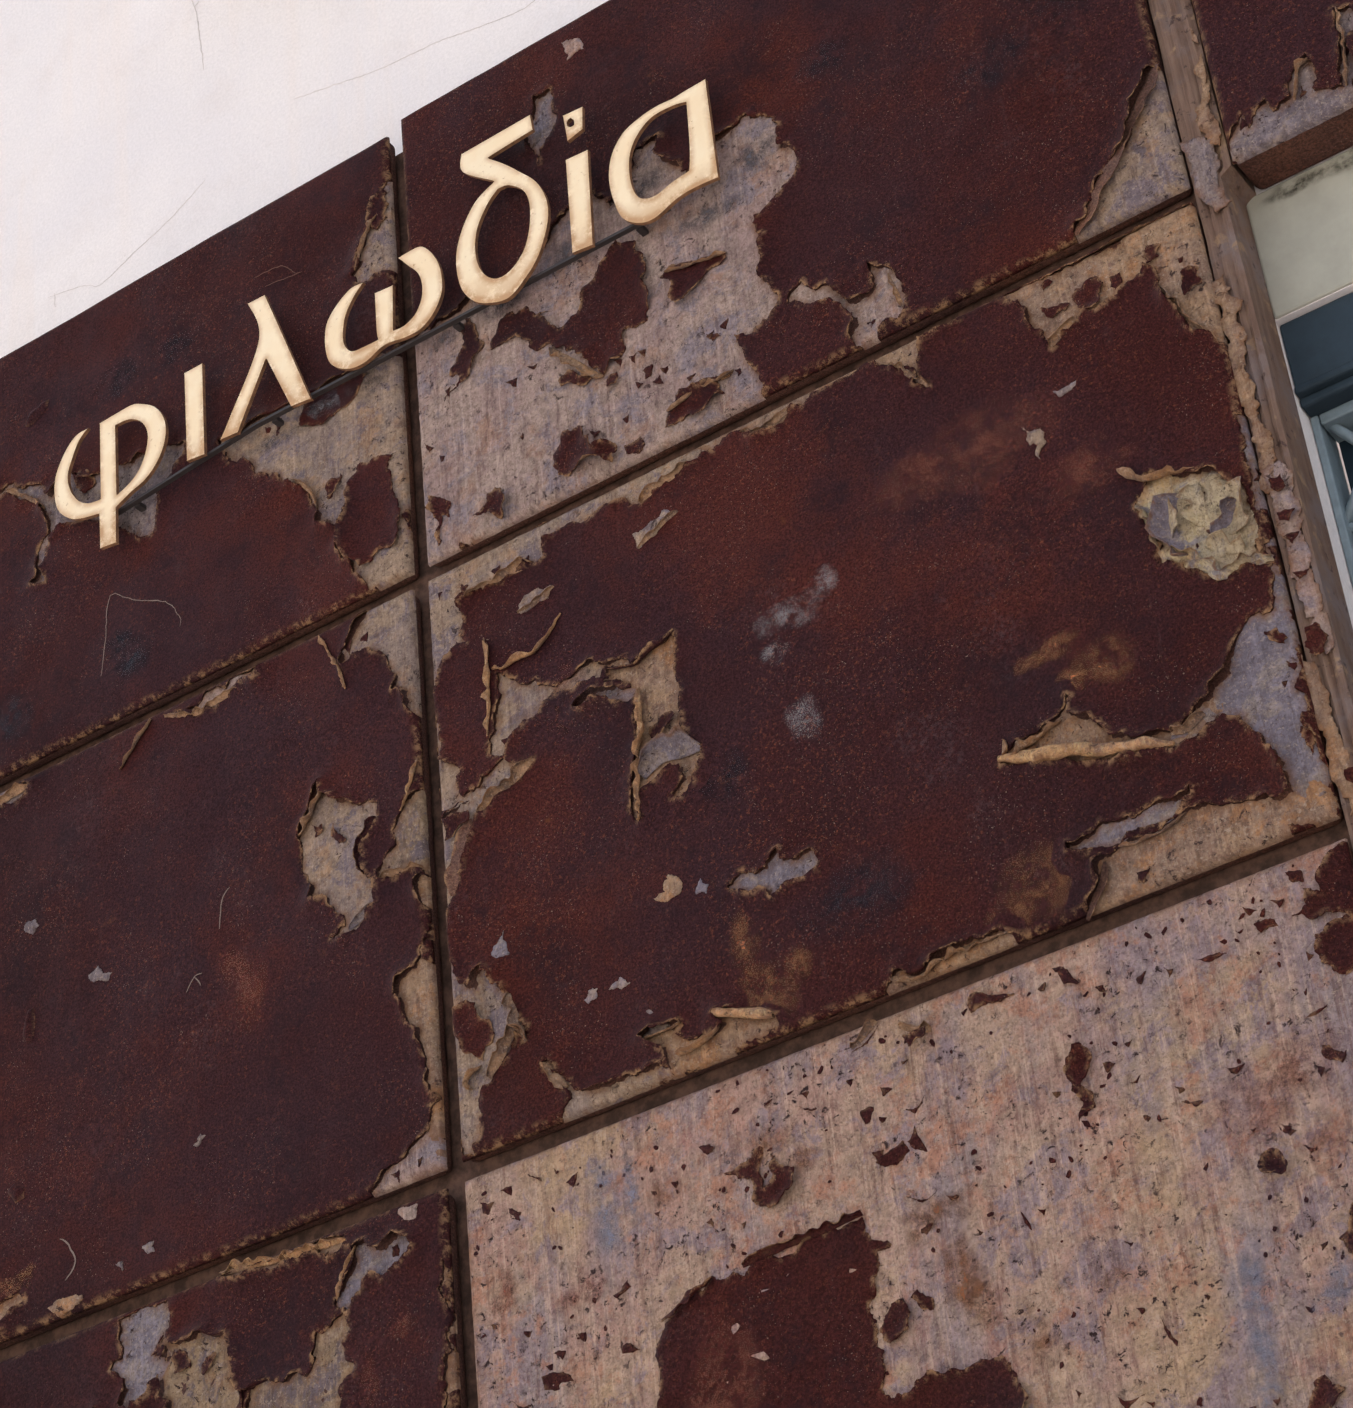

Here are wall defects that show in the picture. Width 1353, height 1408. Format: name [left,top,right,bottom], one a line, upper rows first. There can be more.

crack [295,0,535,99]
peeling [0,484,74,583]
peeling [71,469,101,521]
peeling [119,443,184,537]
peeling [221,116,929,941]
peeling [119,671,252,770]
peeling [440,7,1353,1408]
peeling [0,782,27,805]
peeling [372,930,527,1198]
peeling [0,1294,25,1320]
spalling [48,1294,83,1317]
peeling [112,1203,418,1408]